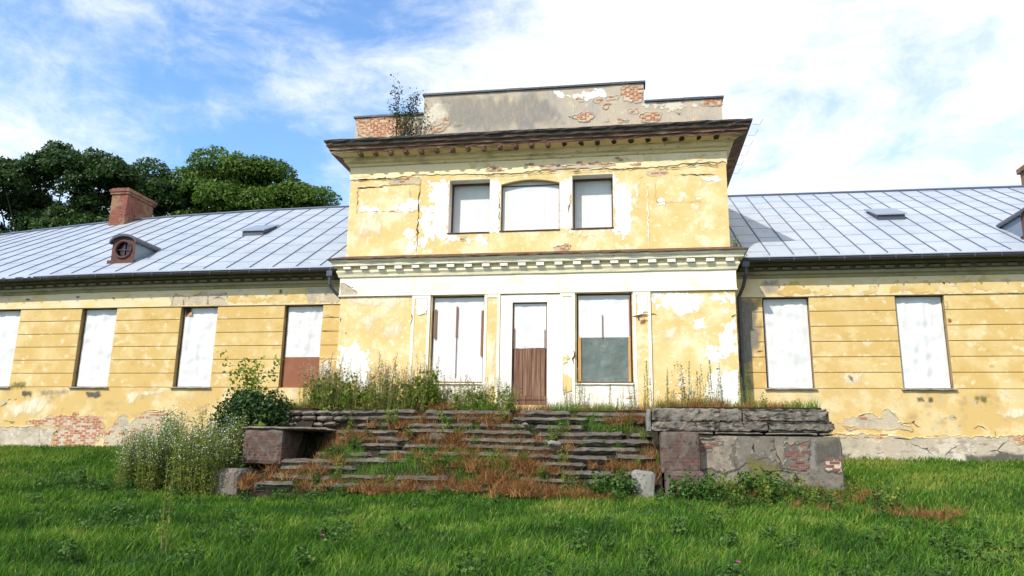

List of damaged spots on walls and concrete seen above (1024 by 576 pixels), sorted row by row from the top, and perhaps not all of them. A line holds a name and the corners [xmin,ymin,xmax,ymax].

spalling [554,85,723,124]
crack [352,176,420,249]
peeling [356,154,669,255]
peeling [778,275,1024,296]
peeling [319,340,373,390]
peeling [637,291,740,406]
spalling [0,391,168,447]
crack [742,422,808,474]
flaking render [824,408,1024,474]